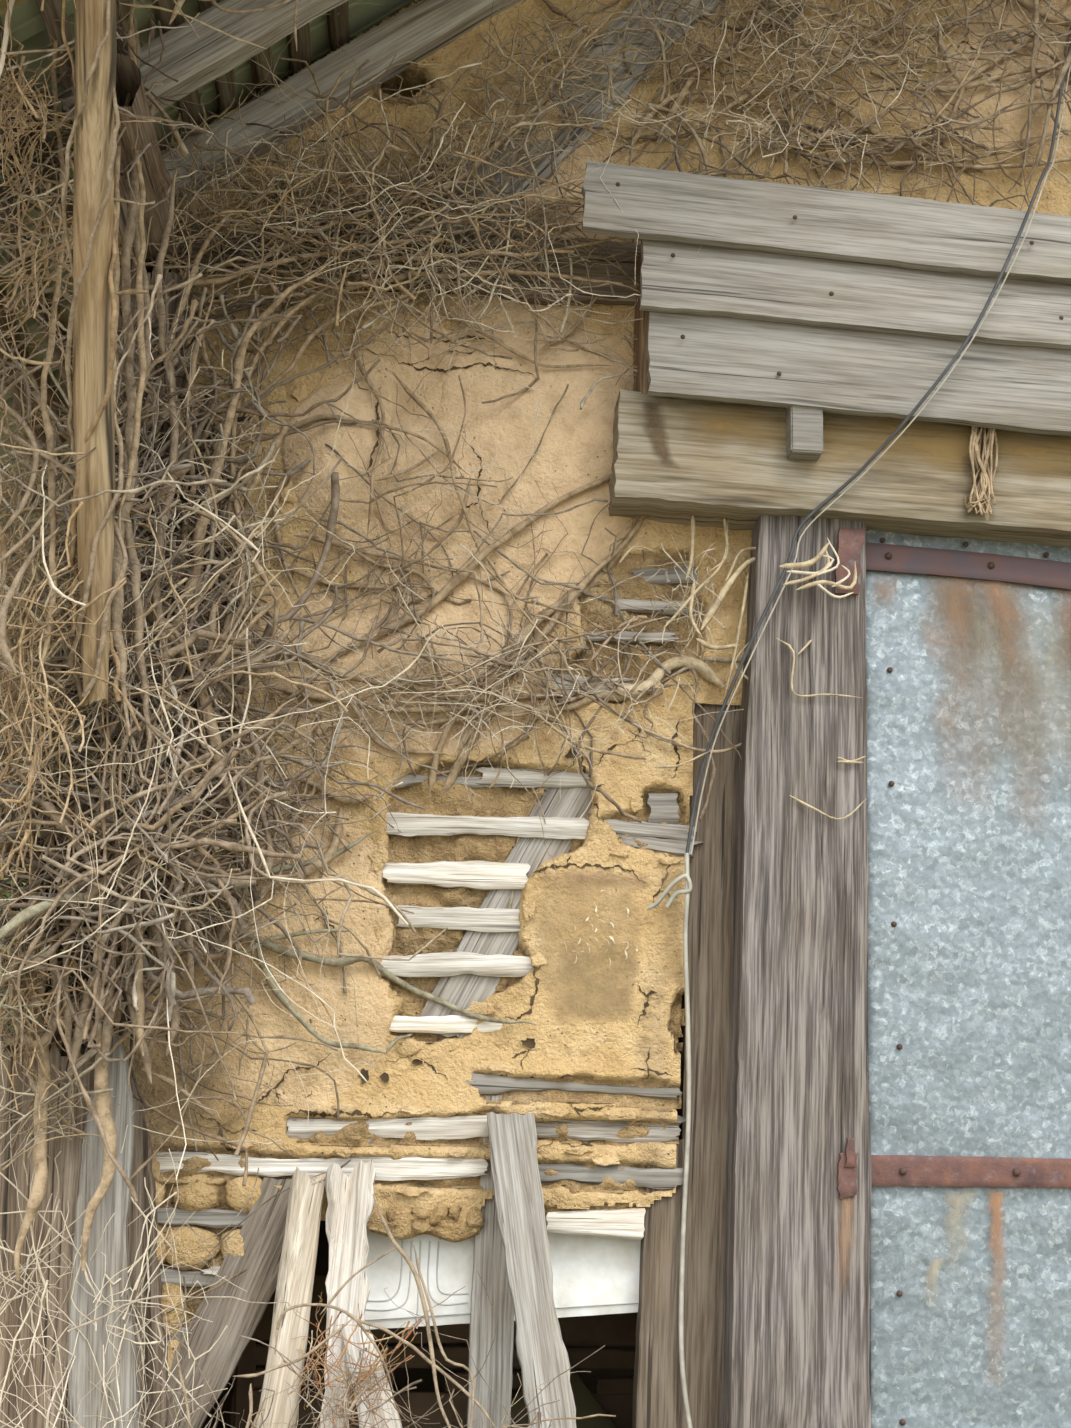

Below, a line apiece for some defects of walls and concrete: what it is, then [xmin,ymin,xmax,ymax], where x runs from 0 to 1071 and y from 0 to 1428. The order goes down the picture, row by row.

spalling [556,549,705,694]
spalling [388,748,550,817]
spalling [368,834,518,956]
spalling [567,839,584,854]
crack [528,853,670,903]
spalling [586,788,689,865]
spalling [466,944,549,1015]
spalling [383,976,441,1067]
spalling [518,1036,538,1051]
spalling [668,993,686,1054]
spalling [156,1062,682,1327]
rust [991,1194,1002,1259]